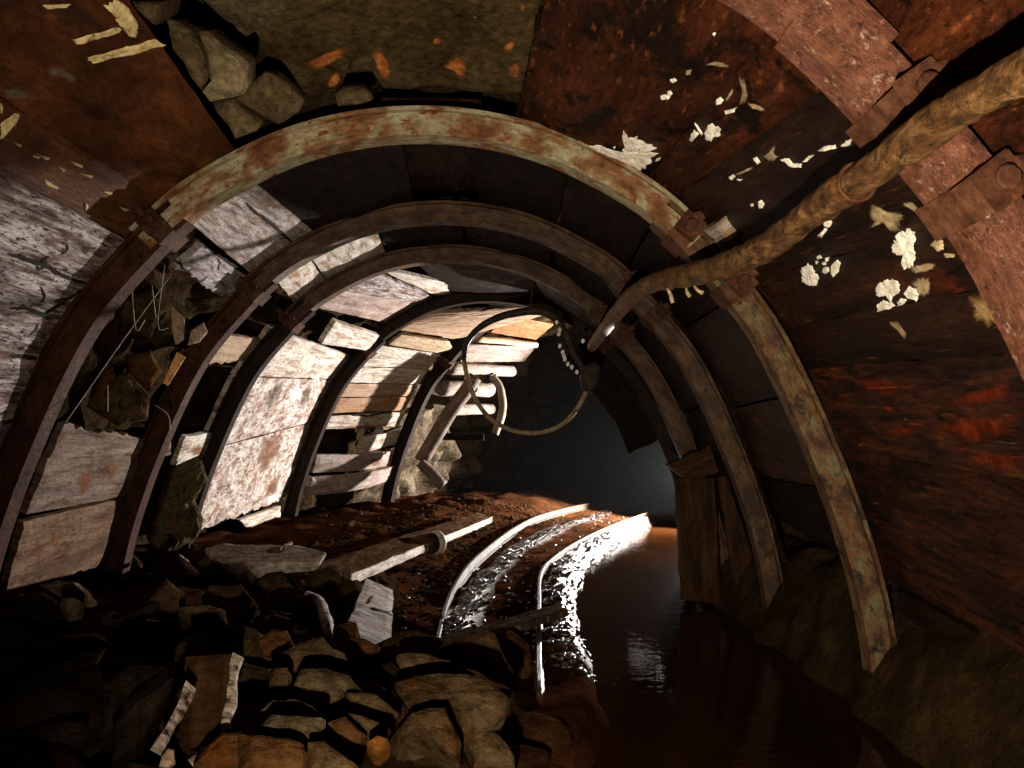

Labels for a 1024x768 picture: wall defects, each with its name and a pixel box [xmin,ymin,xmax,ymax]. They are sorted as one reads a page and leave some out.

peeling [74,0,165,64]